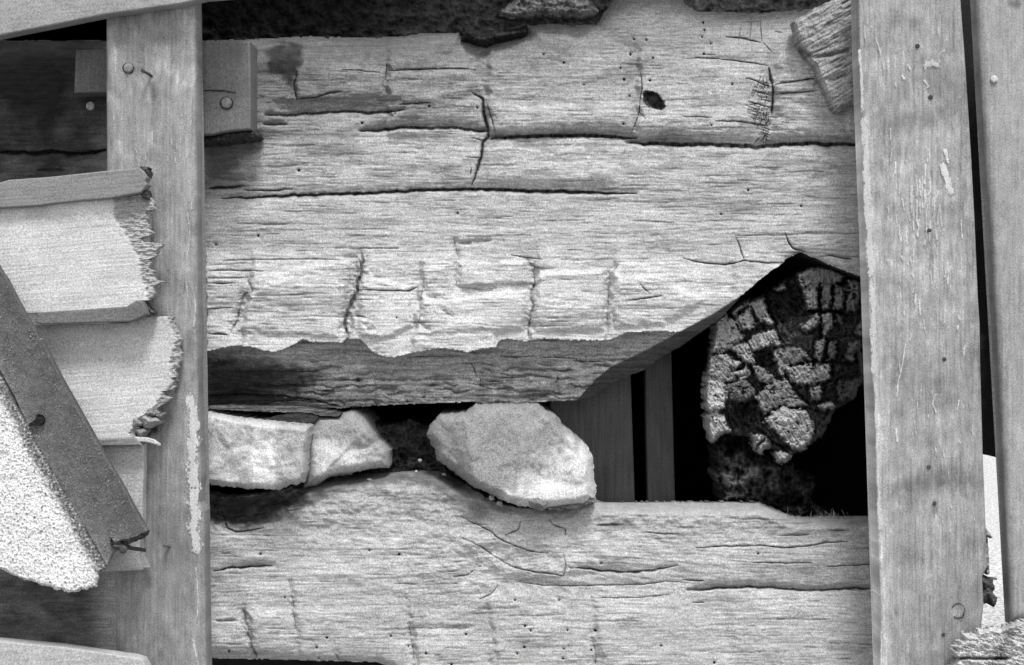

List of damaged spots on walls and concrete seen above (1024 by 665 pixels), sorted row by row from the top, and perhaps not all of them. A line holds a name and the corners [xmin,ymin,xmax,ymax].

water stain [266,42,303,89]
crack [209,20,855,199]
crack [457,519,871,603]